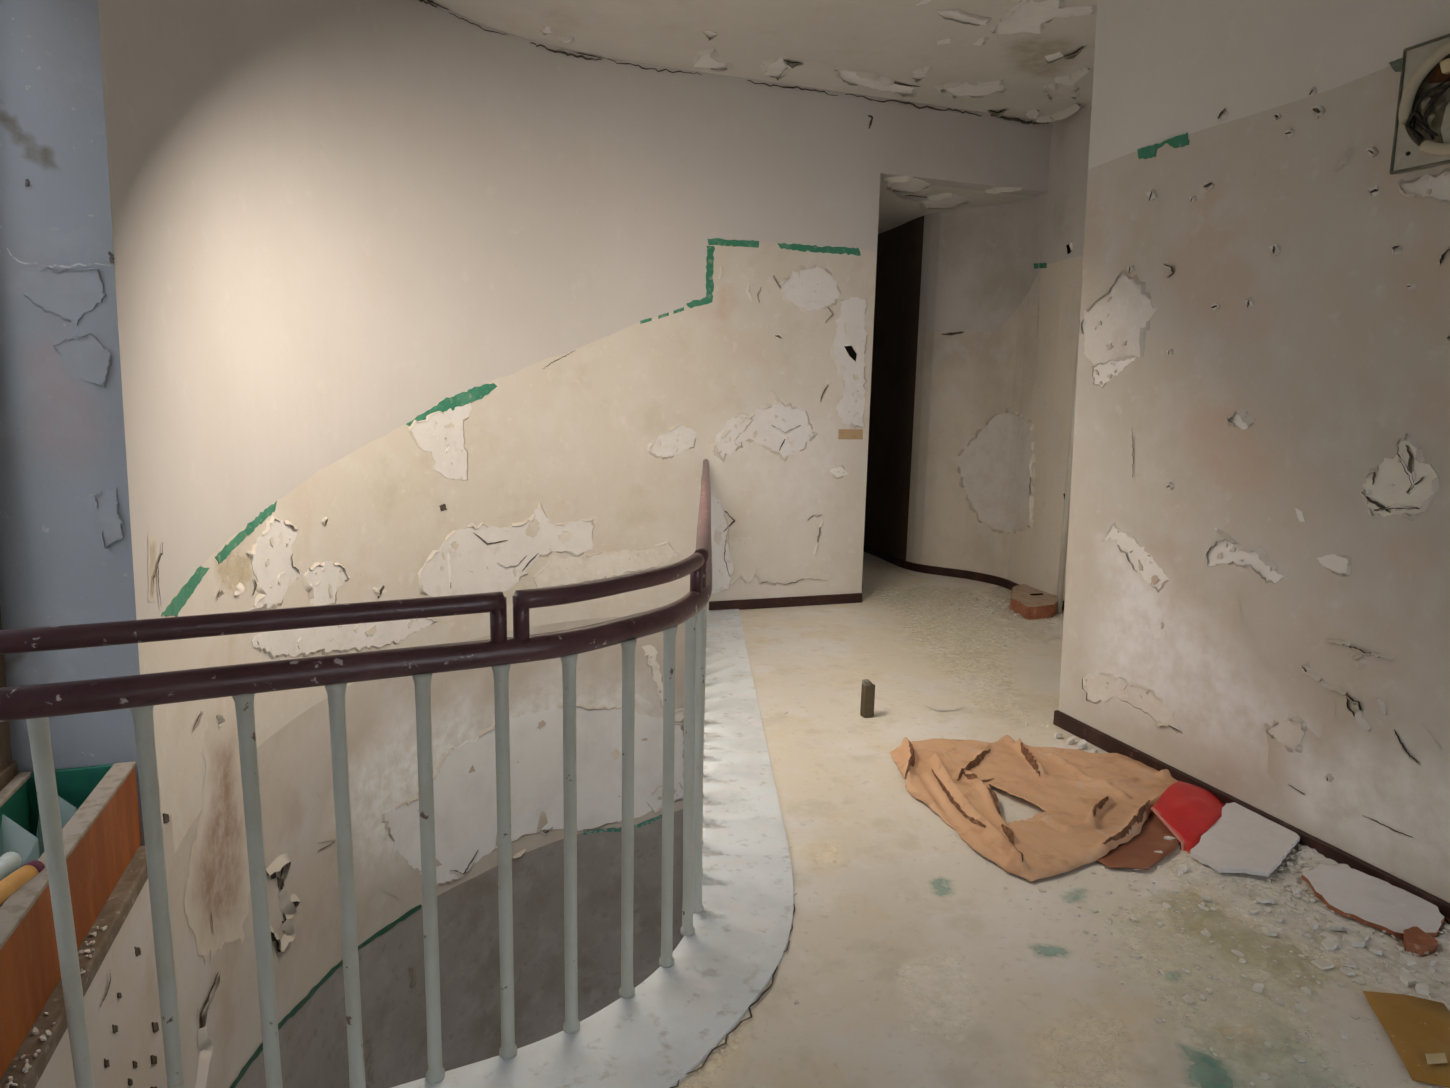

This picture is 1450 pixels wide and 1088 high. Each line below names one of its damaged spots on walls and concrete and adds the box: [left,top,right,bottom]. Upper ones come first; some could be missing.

peeling [916,0,1097,46]
damp [0,82,62,174]
peeling [834,69,1009,118]
peeling [1397,169,1450,204]
peeling [53,333,112,387]
peeling [647,264,868,462]
peeling [1080,265,1158,388]
peeling [92,489,125,549]
peeling [418,501,680,597]
spalling [1359,433,1440,521]
peeling [1082,672,1183,734]
damp [184,714,250,962]